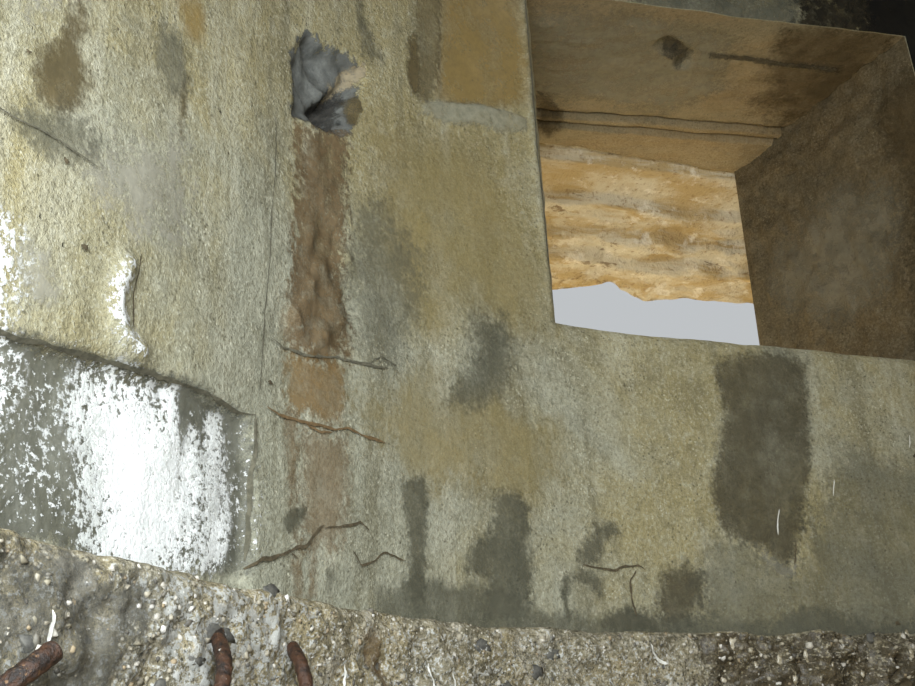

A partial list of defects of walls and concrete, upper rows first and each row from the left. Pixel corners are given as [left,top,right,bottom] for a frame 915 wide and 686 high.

spalling [288,29,366,137]
leakage [16,2,188,243]
corrosion [285,118,355,424]
crack [267,406,385,443]
leakage [0,208,915,686]
crack [243,521,369,569]
crack [353,551,406,566]
crack [583,564,644,616]
spalling [0,641,63,686]
spalling [211,627,233,686]
spalling [287,641,313,686]
corrosion [363,630,387,686]